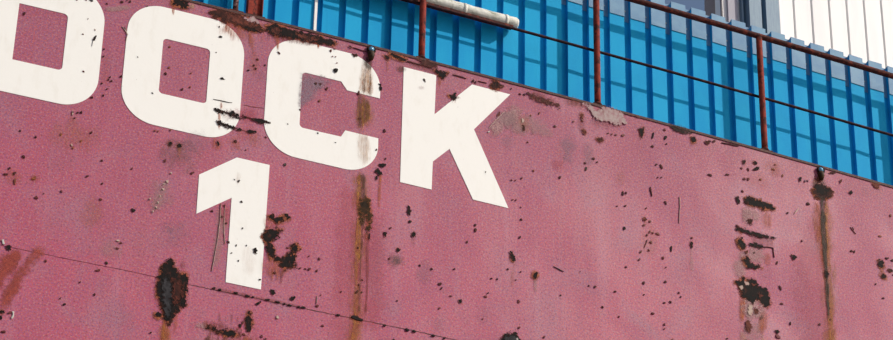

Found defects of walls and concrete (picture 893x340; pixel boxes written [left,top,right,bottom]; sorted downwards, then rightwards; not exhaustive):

rust [170,0,194,12]
rust [349,46,372,127]
peeling [573,102,667,147]
rust [349,175,374,340]
rust [811,178,834,340]